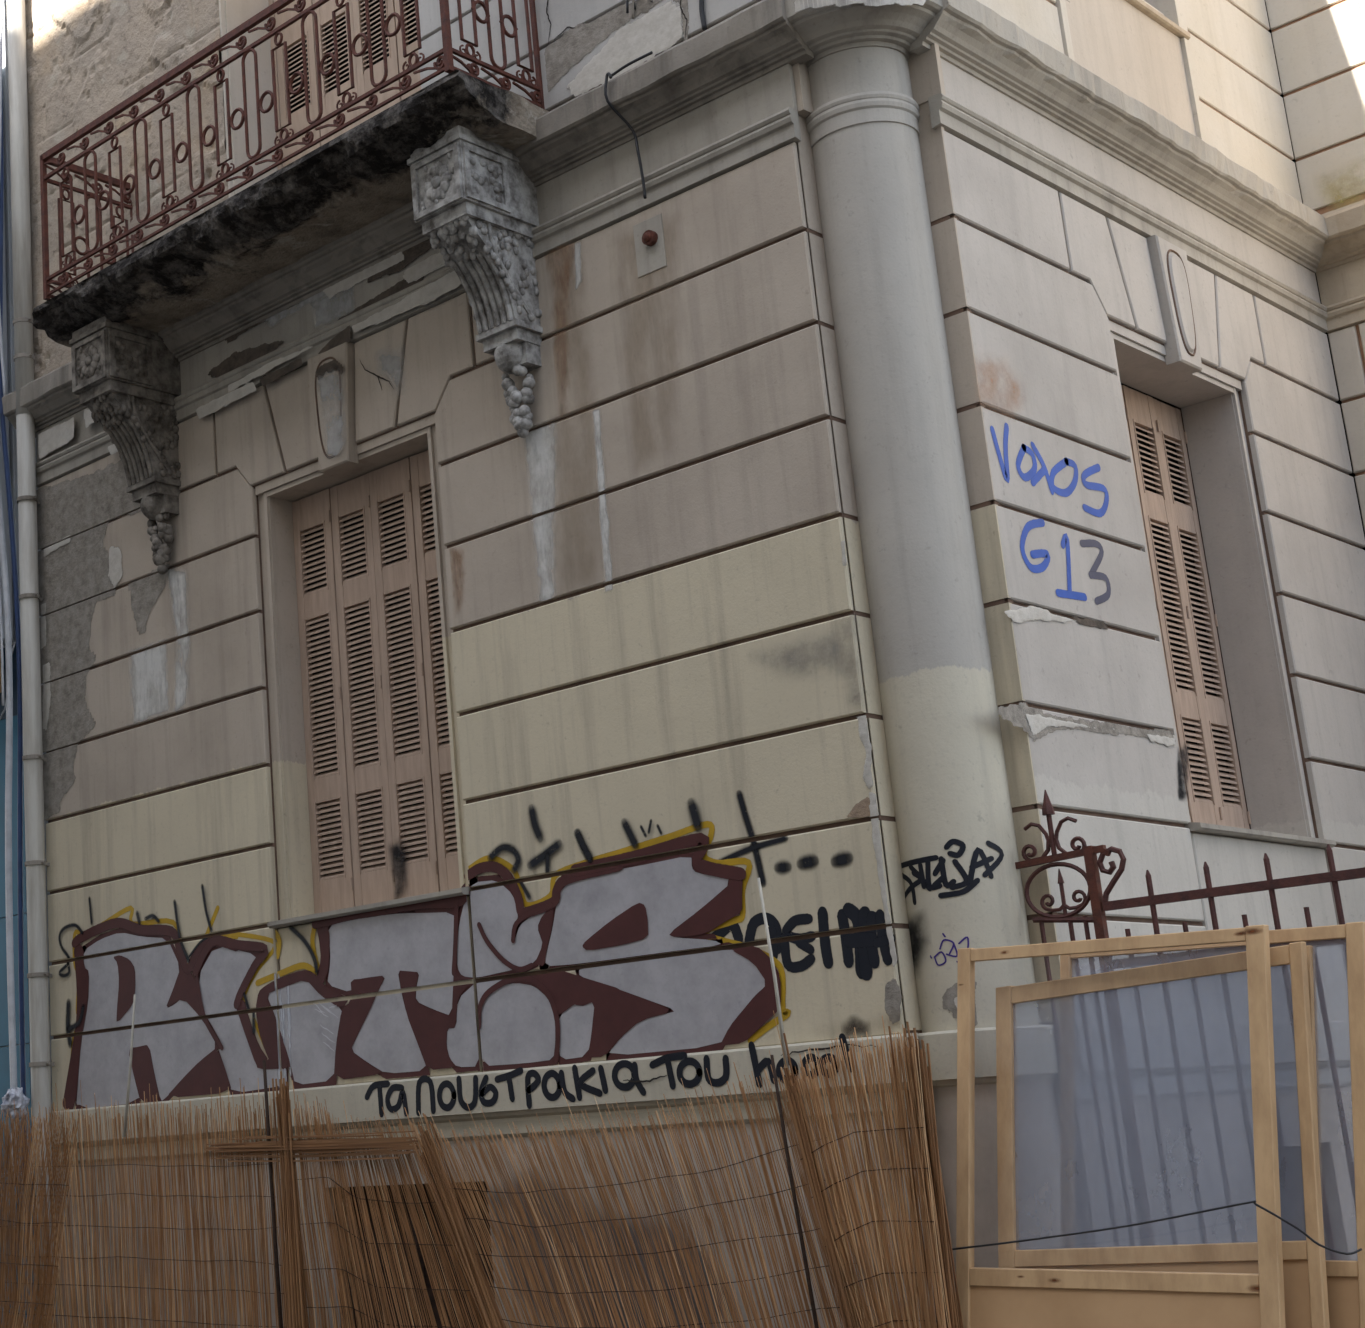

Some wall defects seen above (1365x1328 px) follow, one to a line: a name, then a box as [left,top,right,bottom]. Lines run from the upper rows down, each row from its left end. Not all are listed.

flaking render [544,0,689,97]
peeling [196,239,462,419]
rust [560,244,581,288]
peeling [38,409,94,459]
damp [527,426,555,600]
damp [593,410,612,591]
flaking render [36,444,170,820]